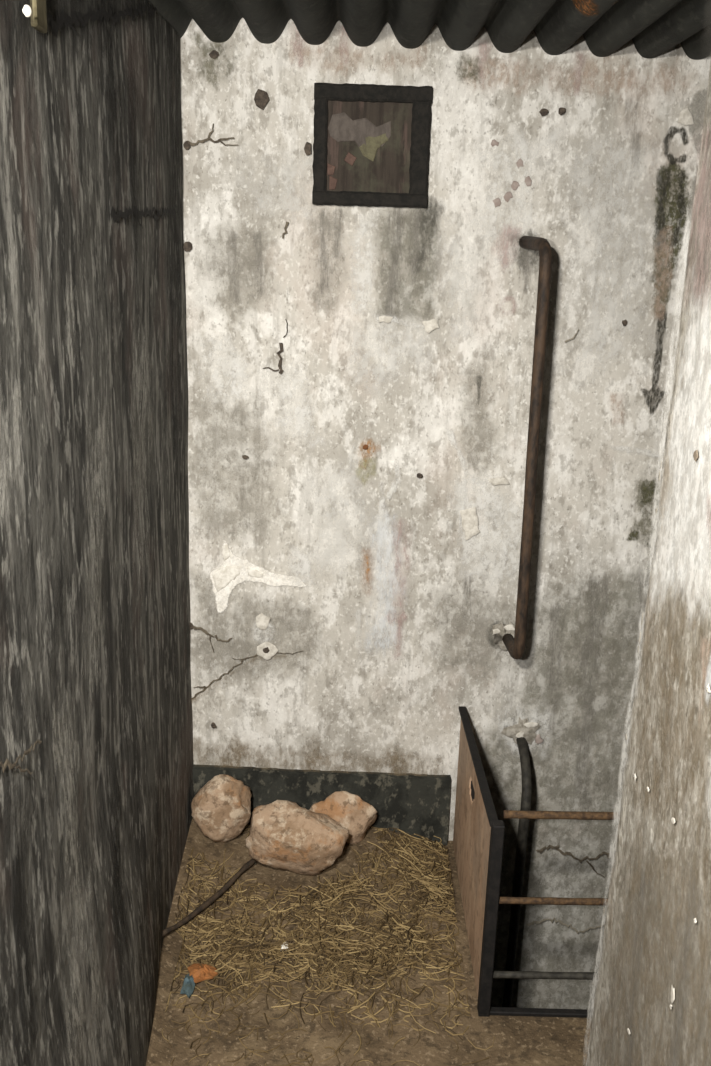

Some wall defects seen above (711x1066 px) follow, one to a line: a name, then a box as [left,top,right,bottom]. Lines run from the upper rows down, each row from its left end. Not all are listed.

crack [183,124,238,150]
rust [358,440,375,481]
leakage [627,479,658,547]
crack [190,622,302,700]
leakage [484,560,650,1009]
crack [536,845,612,878]